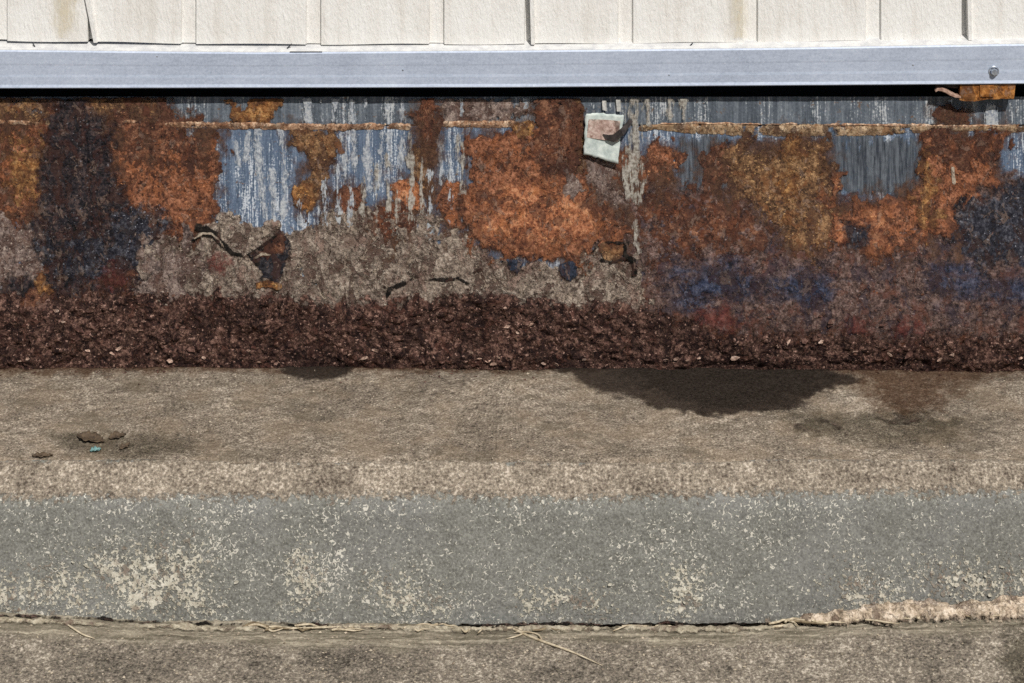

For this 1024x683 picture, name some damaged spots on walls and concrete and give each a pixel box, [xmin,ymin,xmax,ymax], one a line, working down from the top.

rust [20,252,158,330]
rust [0,97,284,251]
crack [191,223,278,266]
spalling [133,205,655,334]
crack [376,268,483,299]
rust [287,98,1024,307]